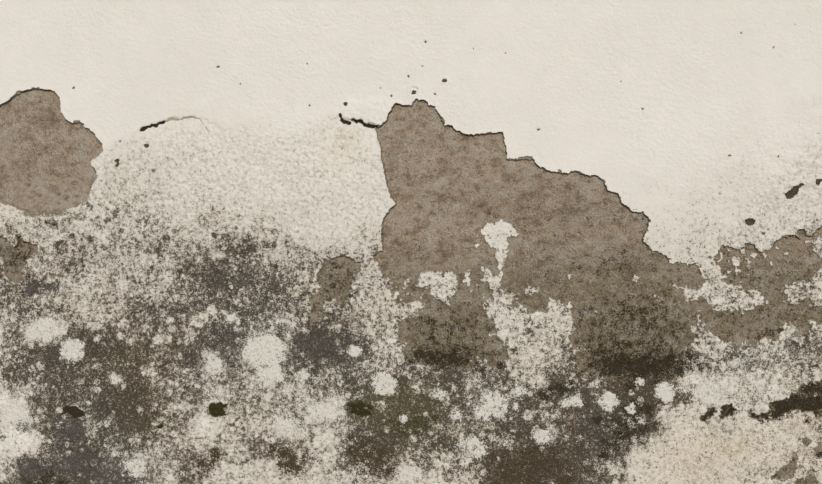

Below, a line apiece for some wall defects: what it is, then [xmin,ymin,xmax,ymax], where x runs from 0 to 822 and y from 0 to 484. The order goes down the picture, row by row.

crack [140,116,209,132]
spalling [0,87,103,214]
spalling [0,234,38,284]
spalling [341,93,822,385]
leakage [23,280,63,297]
leakage [43,341,66,375]
leakage [292,328,363,368]
leakage [406,347,486,375]
leakage [524,380,578,400]
leakage [578,346,704,460]
mould [751,381,822,433]
leakage [16,405,148,484]